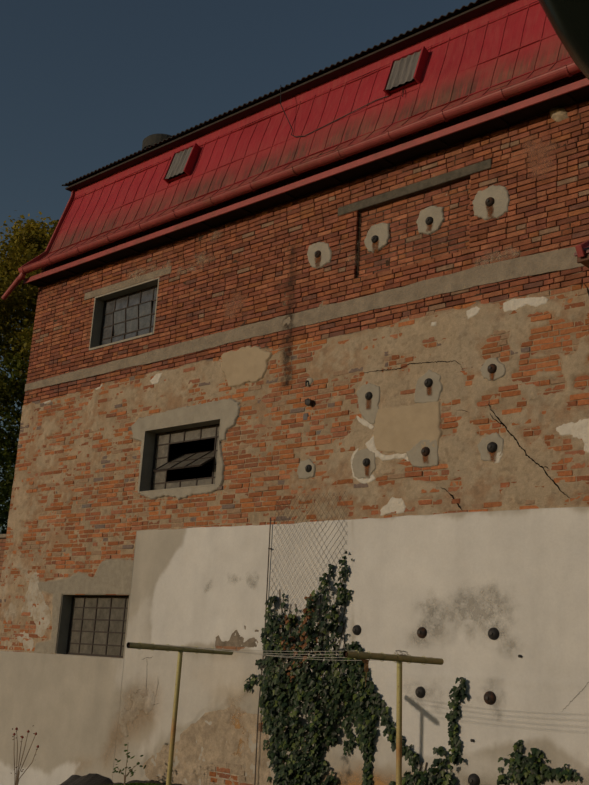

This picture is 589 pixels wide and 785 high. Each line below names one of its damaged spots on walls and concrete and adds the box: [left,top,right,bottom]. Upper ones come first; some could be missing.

crack [360,360,463,374]
spalling [441,289,589,476]
spalling [29,433,71,515]
flaking render [363,497,406,516]
spalling [350,416,461,486]
crack [488,404,570,498]
flaking render [12,572,51,652]
spalling [215,625,266,651]
spalling [143,705,272,785]